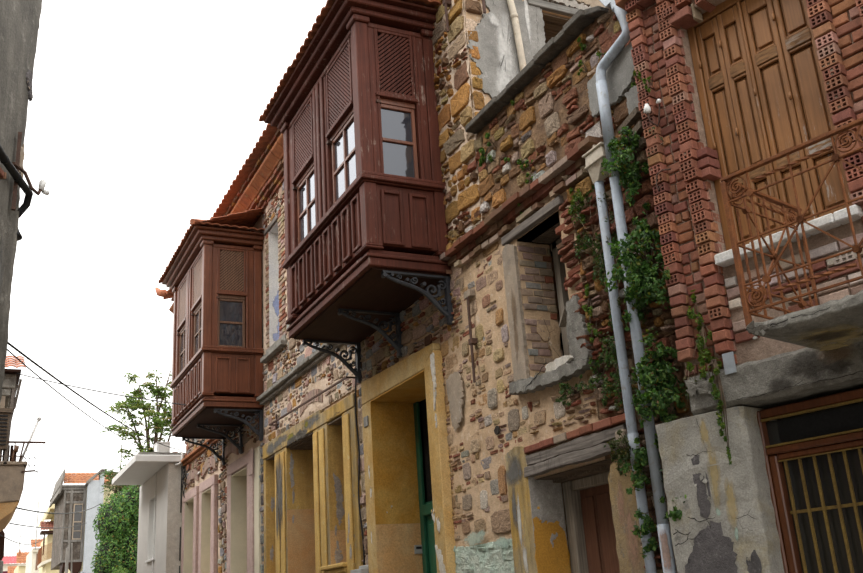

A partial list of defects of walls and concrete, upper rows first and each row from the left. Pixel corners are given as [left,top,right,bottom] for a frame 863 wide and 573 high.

spalling [685,455,762,573]